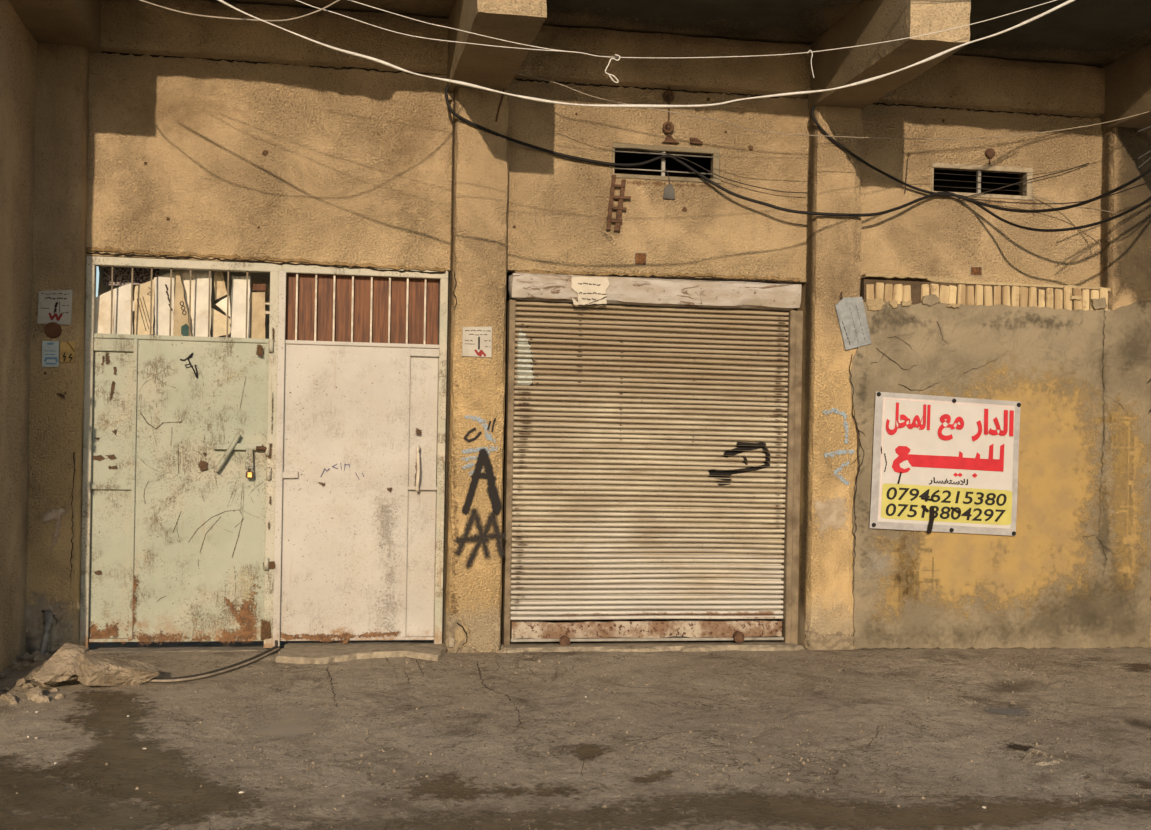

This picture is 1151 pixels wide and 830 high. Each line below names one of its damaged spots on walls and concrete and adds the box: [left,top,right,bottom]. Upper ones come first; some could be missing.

corrosion [89,561,400,645]
water stain [1117,663,1151,672]
water stain [0,689,1151,830]